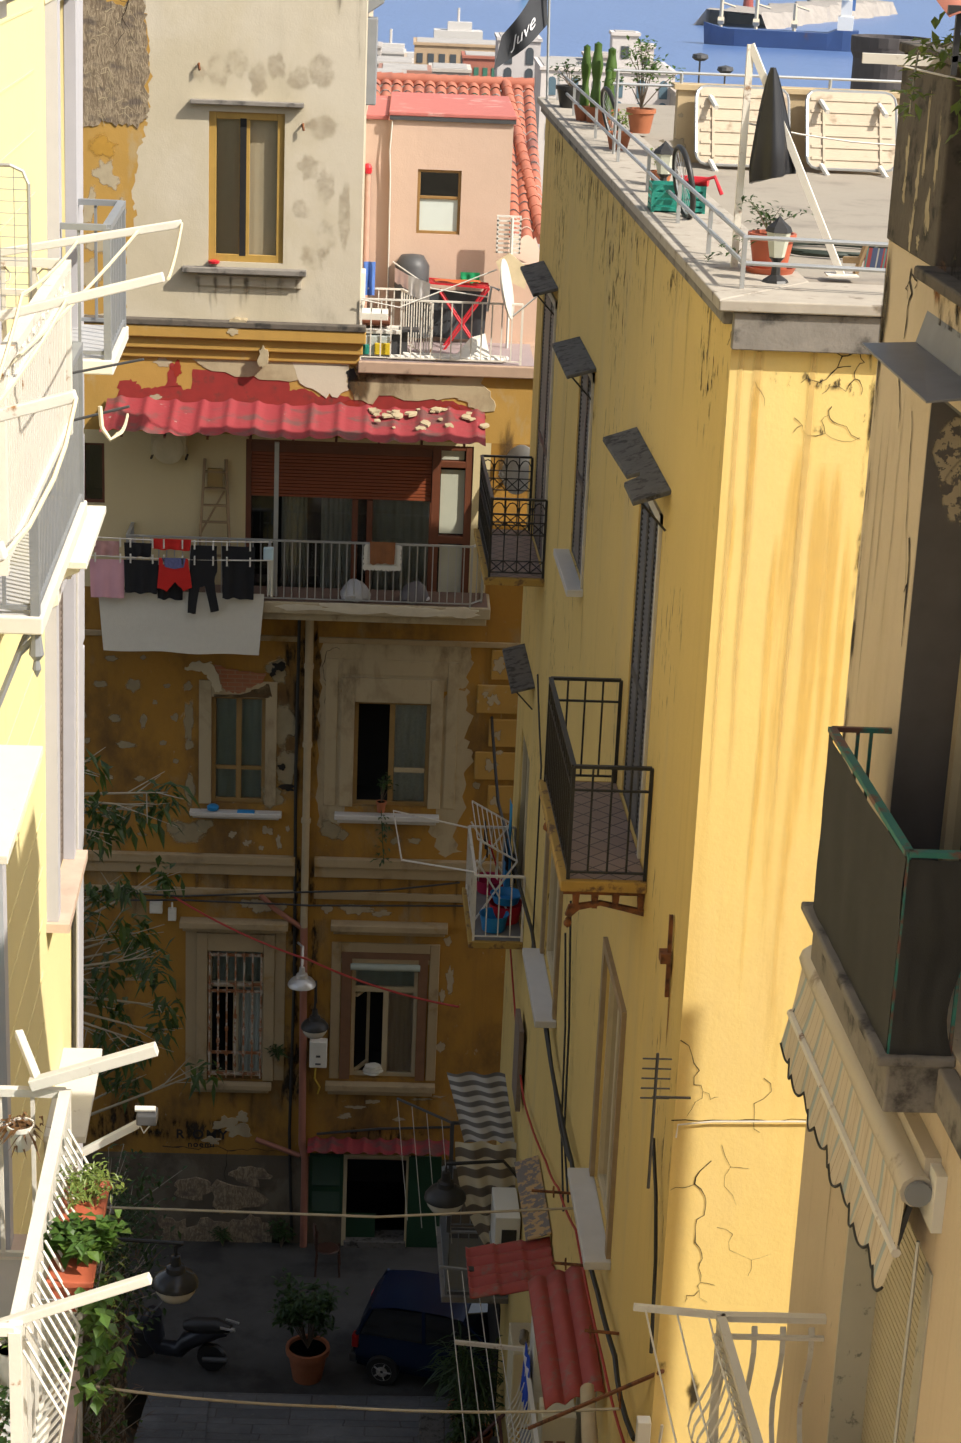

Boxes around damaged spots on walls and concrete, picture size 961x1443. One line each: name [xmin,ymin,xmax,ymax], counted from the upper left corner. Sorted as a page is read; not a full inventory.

spalling [227,317,248,336]
peeling [117,345,496,419]
crack [755,353,865,442]
crack [898,381,912,645]
flaking render [184,659,295,809]
flaking render [315,643,503,857]
flaking render [167,774,214,842]
peeling [228,826,290,850]
spalling [157,1166,273,1243]
crack [671,1040,805,1301]